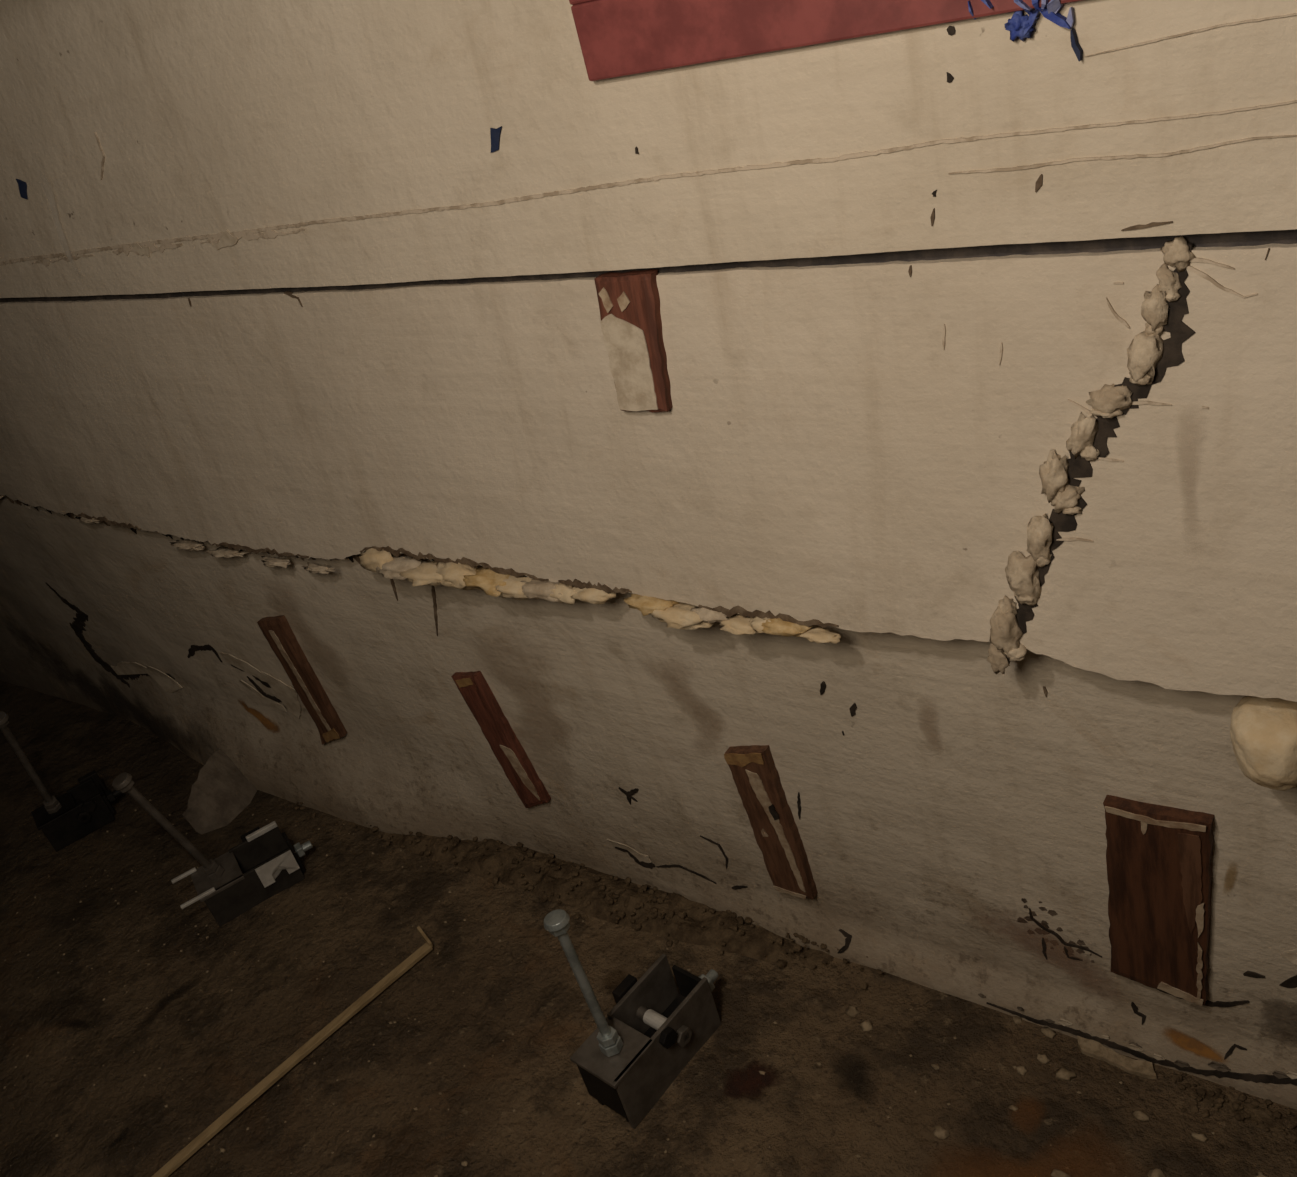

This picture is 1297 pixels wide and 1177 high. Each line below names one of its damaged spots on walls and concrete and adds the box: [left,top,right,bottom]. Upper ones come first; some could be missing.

crack [1084,13,1297,57]
crack [0,100,1297,265]
crack [0,229,1297,688]
crack [618,787,639,805]
crack [700,835,748,890]
crack [978,898,1297,1086]